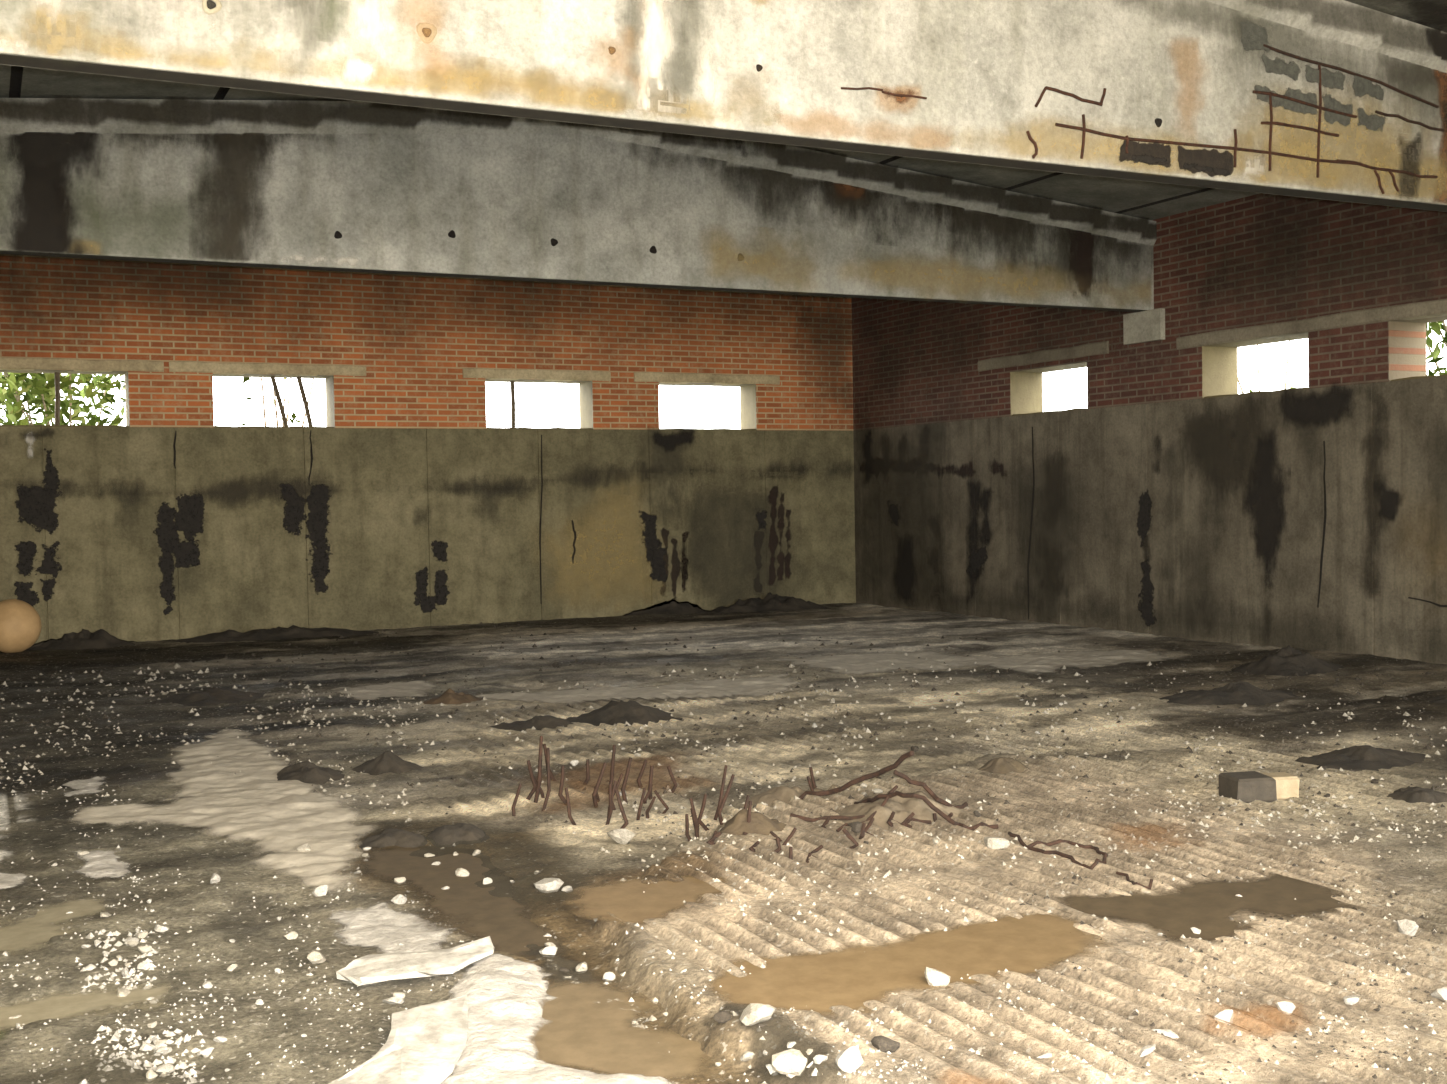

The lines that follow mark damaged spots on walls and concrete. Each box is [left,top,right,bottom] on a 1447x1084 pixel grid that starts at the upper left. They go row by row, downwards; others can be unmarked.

water stain [0,97,513,260]
water stain [344,60,401,84]
water stain [419,73,491,93]
spalling [1035,20,1445,194]
rust [1434,70,1447,203]
water stain [1187,398,1261,491]
water stain [1281,385,1352,425]
water stain [195,479,335,505]
water stain [660,528,689,599]
water stain [754,463,806,592]
water stain [1364,400,1400,596]